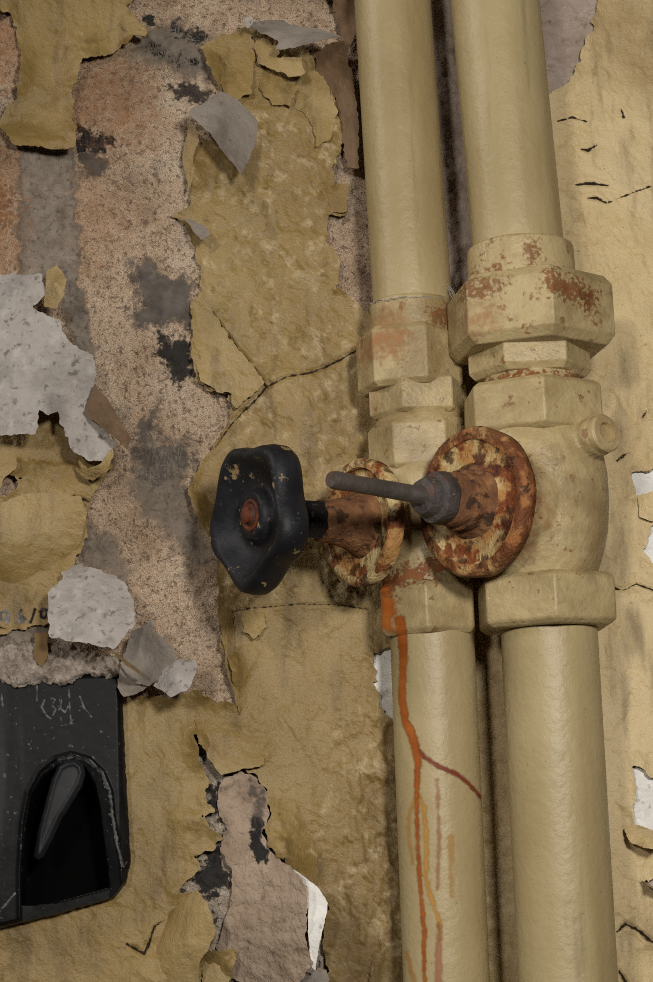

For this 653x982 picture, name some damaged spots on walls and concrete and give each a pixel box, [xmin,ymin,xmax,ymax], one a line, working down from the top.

crack [575,182,651,203]
corrosion [457,263,515,301]
corrosion [523,237,599,315]
corrosion [488,368,580,381]
peeling [0,0,373,982]
peeling [632,470,653,563]
peeling [373,648,393,719]
corrosion [380,557,481,982]
peeling [624,766,653,849]
crack [616,923,653,943]